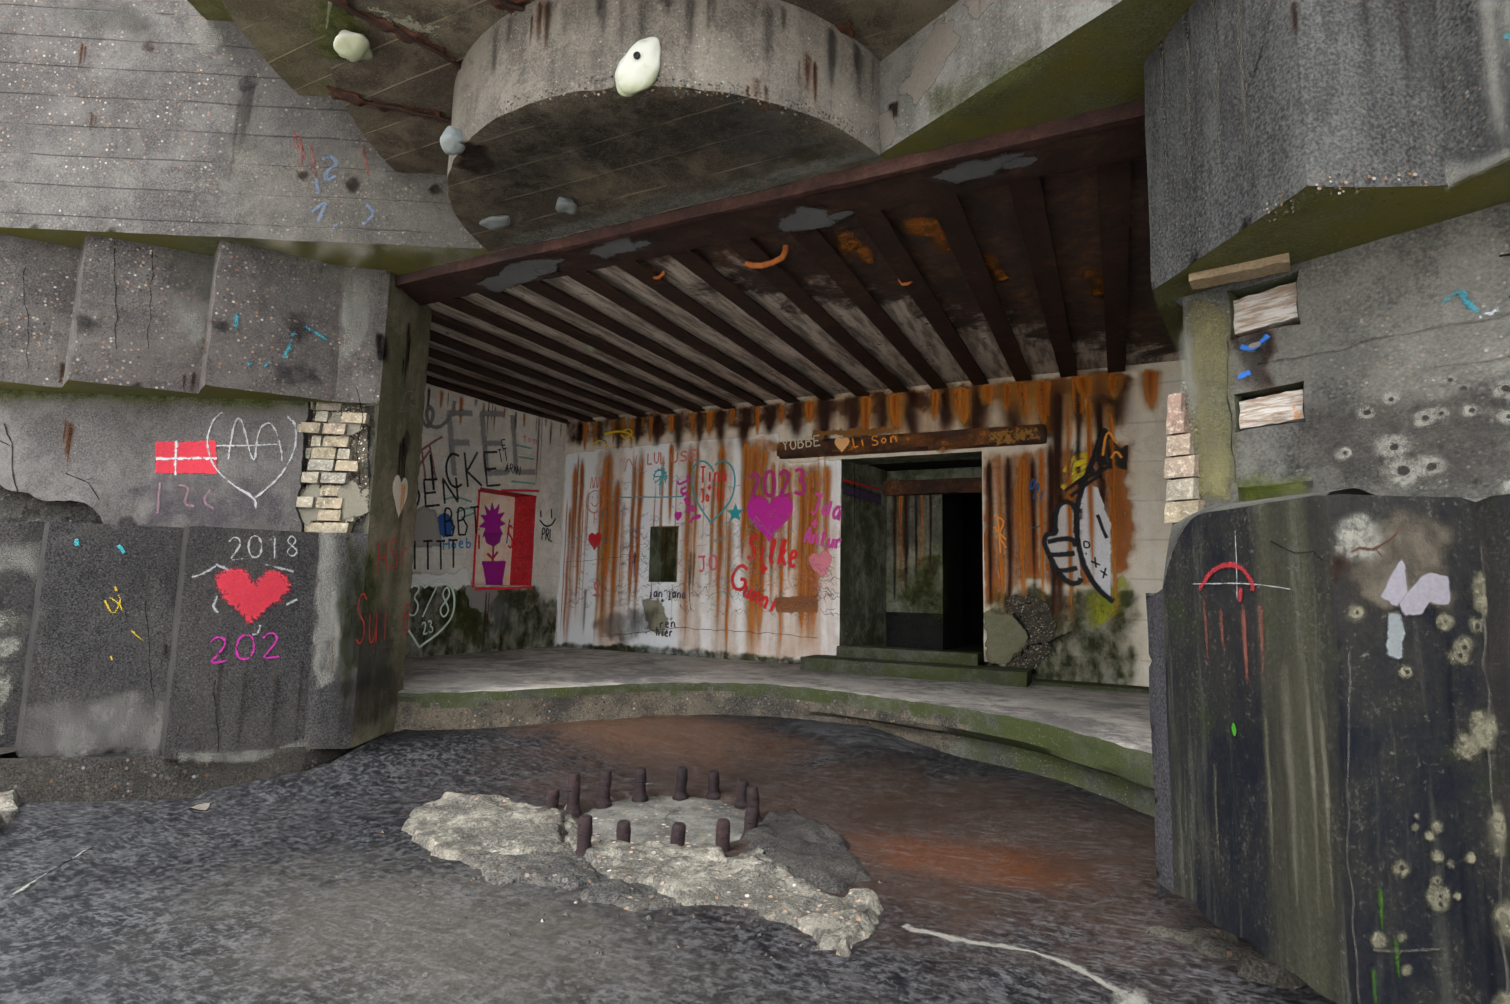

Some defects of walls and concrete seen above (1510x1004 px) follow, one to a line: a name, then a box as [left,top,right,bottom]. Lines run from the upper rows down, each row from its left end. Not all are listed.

rust [530,3,548,41]
rust [805,54,817,99]
rust [903,217,952,252]
crack [1269,313,1510,362]
crack [0,423,18,492]
crack [1226,341,1236,482]
spalling [296,402,370,686]
rust [427,369,1160,648]
spalling [984,595,1056,670]
peeling [1335,512,1483,677]
leakage [1265,666,1333,898]
spalling [1413,814,1476,910]